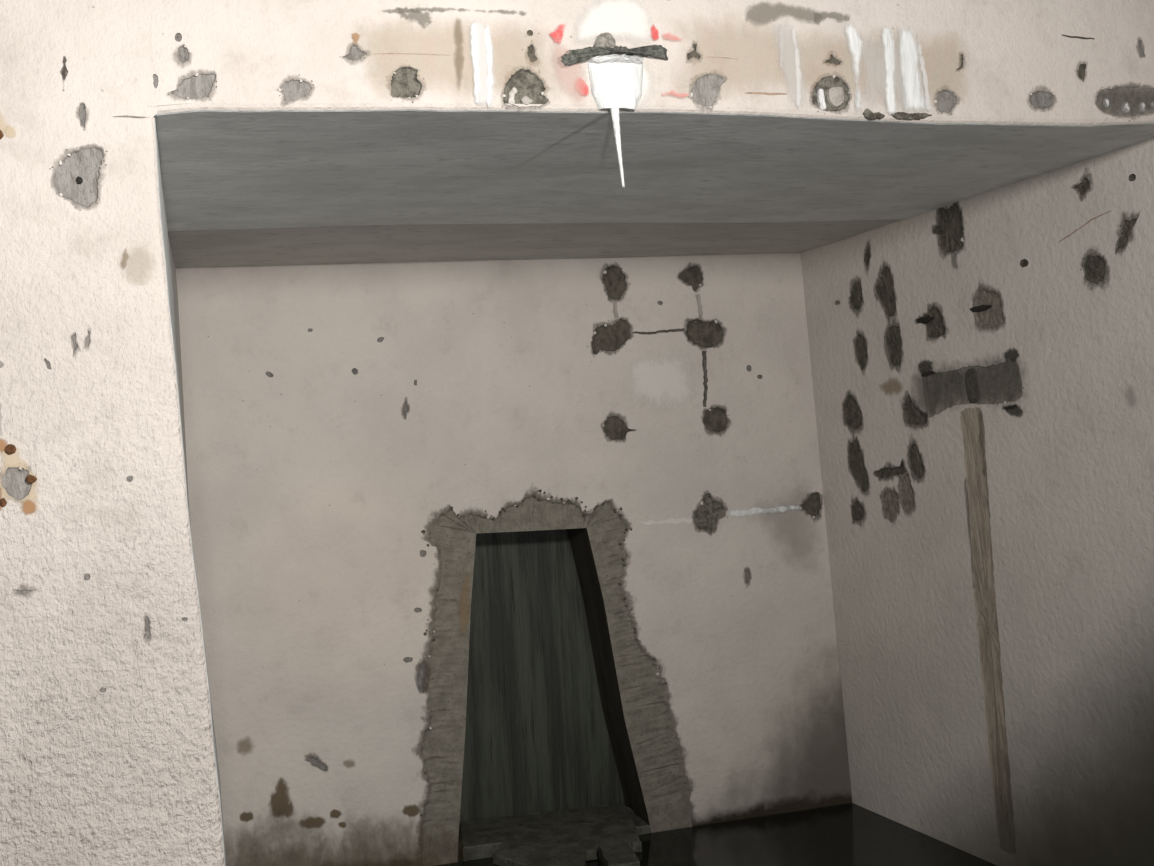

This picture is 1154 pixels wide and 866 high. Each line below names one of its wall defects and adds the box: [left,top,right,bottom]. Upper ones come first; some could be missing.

spalling [1096,83,1154,121]
rust [0,120,15,140]
spalling [49,146,108,211]
rust [0,439,35,514]
flaking render [403,489,694,865]
damp [271,779,346,828]
damp [403,805,419,816]
damp [235,833,437,866]